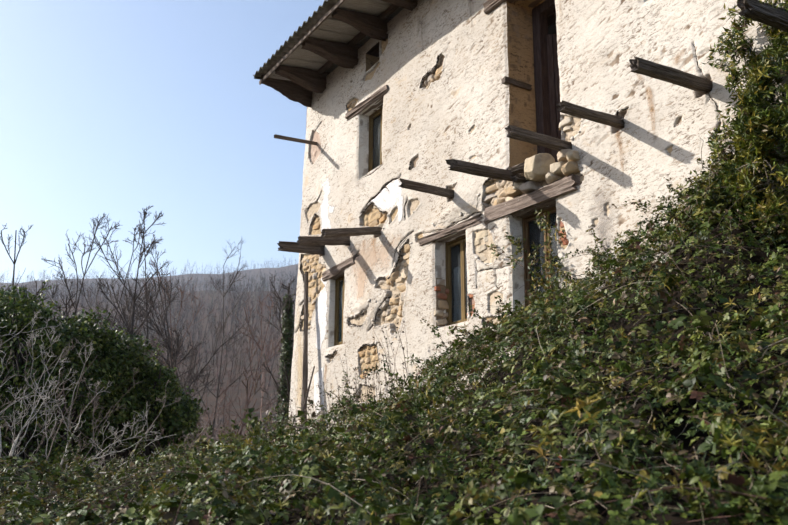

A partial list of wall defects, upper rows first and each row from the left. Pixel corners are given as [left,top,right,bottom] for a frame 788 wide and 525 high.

flaking render [420,51,445,90]
flaking render [477,116,584,207]
peeling [358,179,420,229]
flaking render [474,229,498,265]
flaking render [347,233,423,338]
flaking render [434,278,449,327]
flaking render [299,254,337,415]
flaking render [356,341,380,403]